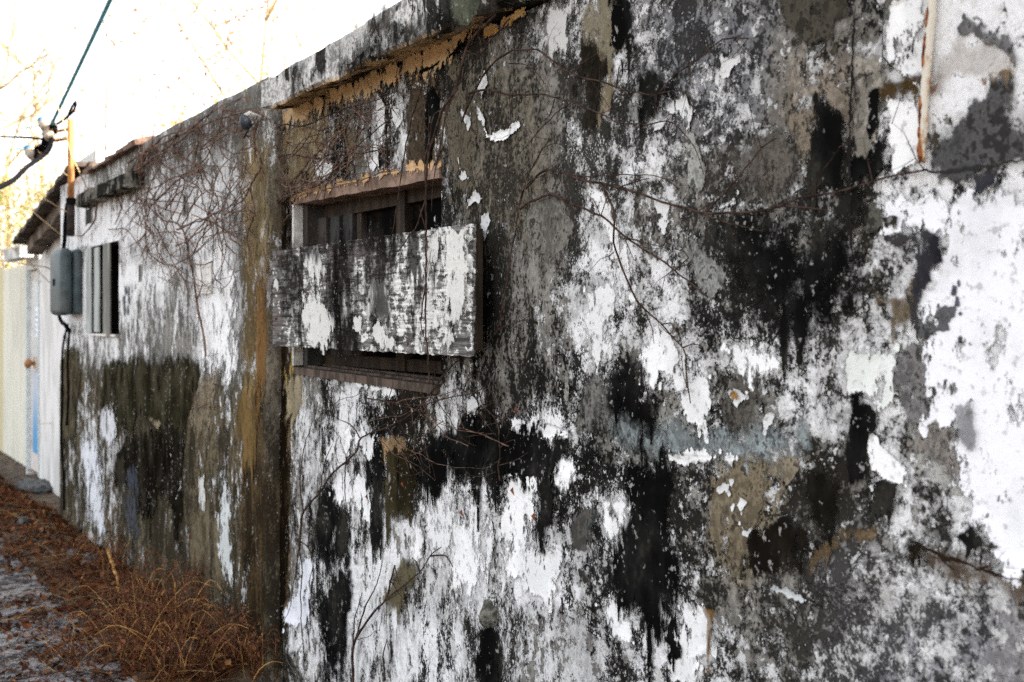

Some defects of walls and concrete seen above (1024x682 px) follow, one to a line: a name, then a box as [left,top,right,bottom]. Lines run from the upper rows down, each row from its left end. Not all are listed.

peeling [282,0,613,241]
corrosion [921,7,929,68]
corrosion [914,84,938,178]
damp [714,73,921,386]
peeling [718,0,1024,591]
damp [100,351,203,549]
peeling [282,554,316,633]
peeling [323,422,378,525]
damp [364,407,606,565]
peeling [407,473,631,626]
damp [606,355,686,682]
damp [741,391,898,578]